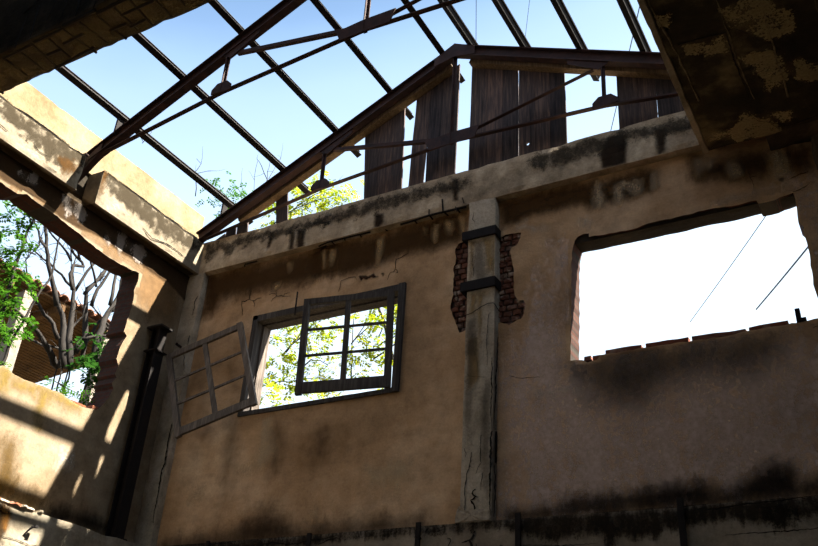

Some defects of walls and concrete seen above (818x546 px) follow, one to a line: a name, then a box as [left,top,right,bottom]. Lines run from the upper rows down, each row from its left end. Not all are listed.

spalling [0,0,203,94]
leakage [600,136,627,168]
leakage [656,132,665,154]
leakage [201,214,466,317]
flaking render [451,244,468,332]
flaking render [499,234,526,325]
crack [464,315,535,512]
crack [153,424,172,523]
crack [448,531,477,546]
leakage [163,464,818,546]